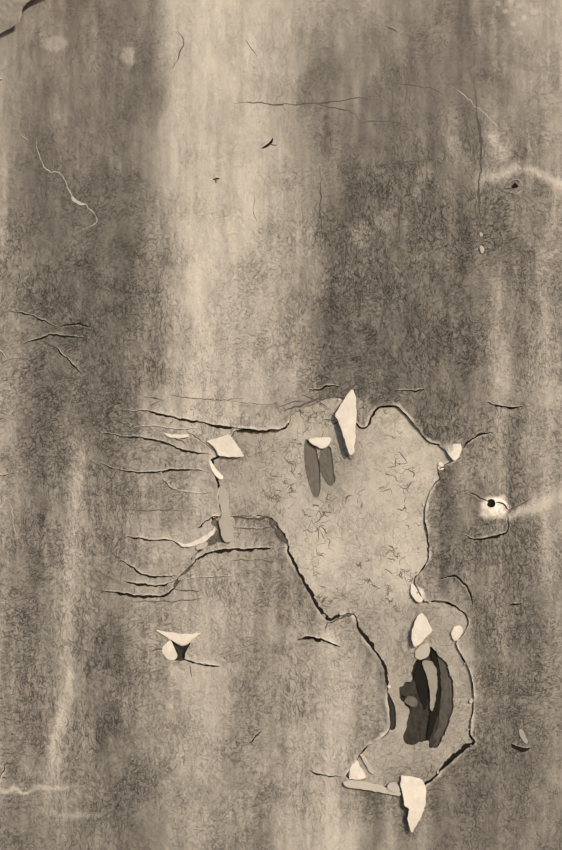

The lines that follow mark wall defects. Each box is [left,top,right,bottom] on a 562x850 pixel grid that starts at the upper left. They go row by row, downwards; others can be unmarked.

peeling [0,0,31,34]
crack [212,171,220,183]
crack [261,136,276,149]
crack [314,166,330,243]
crack [0,298,92,385]
water stain [291,0,562,850]
crack [81,379,343,603]
peeling [156,630,201,660]
peeling [178,390,475,837]